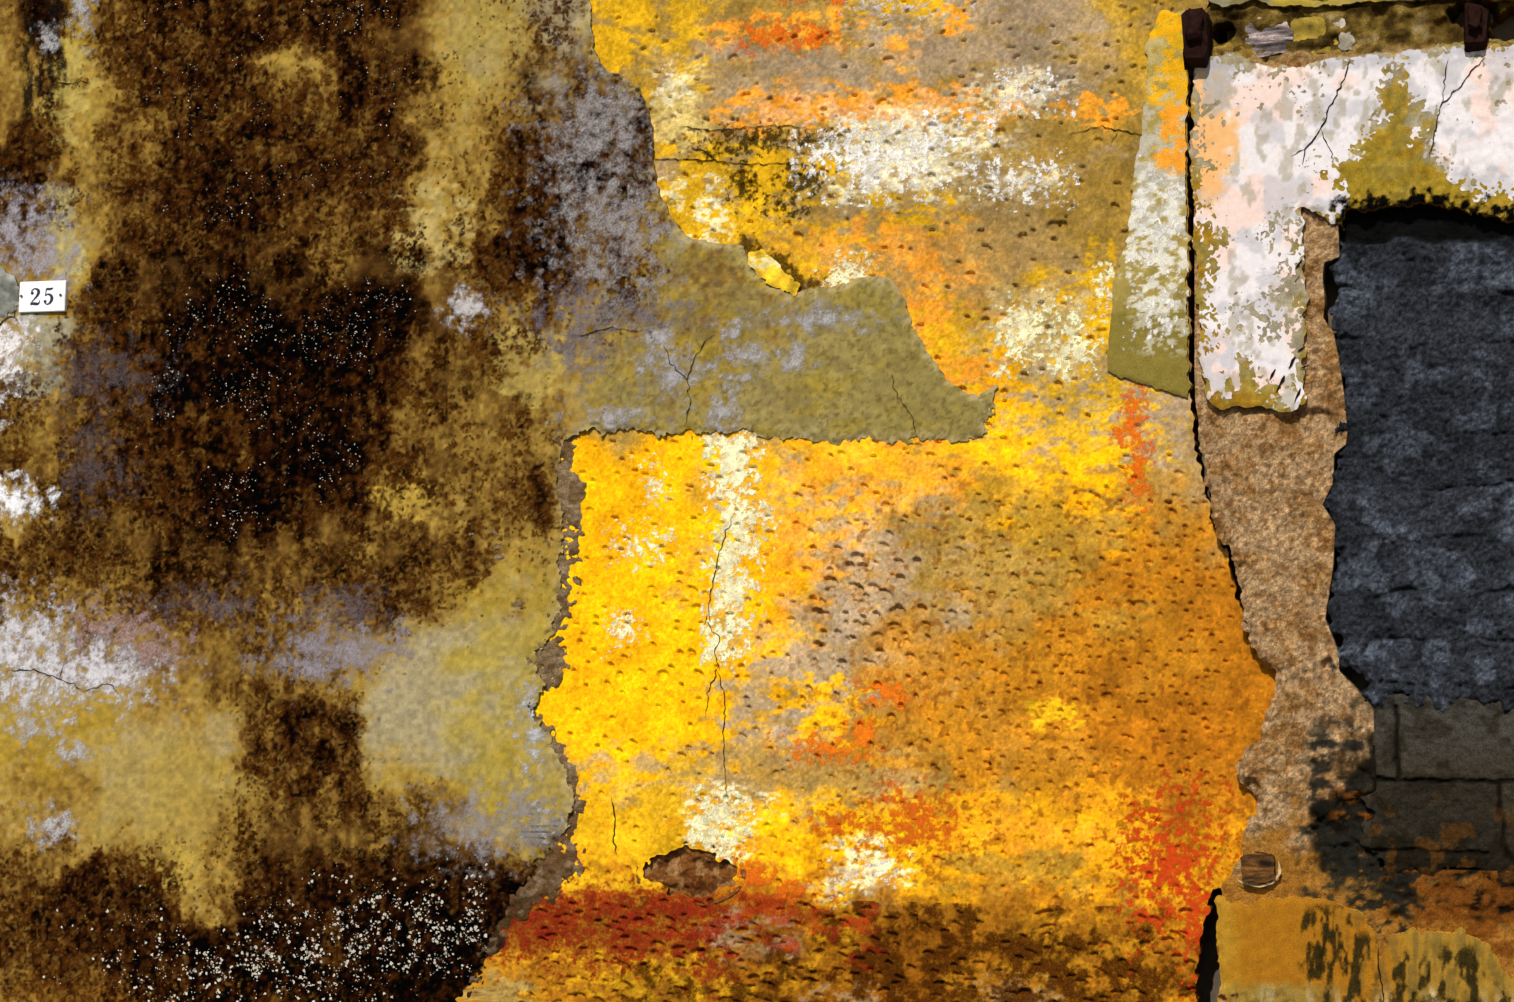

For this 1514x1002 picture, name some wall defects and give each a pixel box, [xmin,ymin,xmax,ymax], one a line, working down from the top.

crack [1292,61,1350,164]
water stain [0,0,1201,1002]
flaking render [455,0,1514,1002]
crack [705,512,735,793]
rust [1100,764,1242,1000]